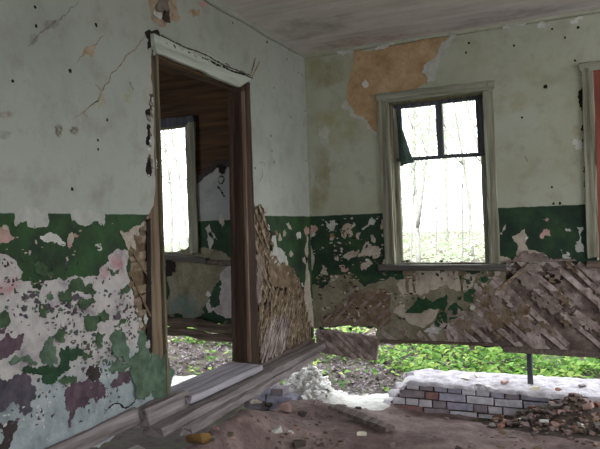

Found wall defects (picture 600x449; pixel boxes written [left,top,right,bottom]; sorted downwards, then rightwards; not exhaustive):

crack [28,3,78,46]
crack [74,35,145,118]
spalling [145,0,253,79]
spalling [337,34,458,135]
spalling [145,94,154,177]
peeling [0,205,157,449]
peeling [165,225,231,318]
spalling [254,204,600,363]